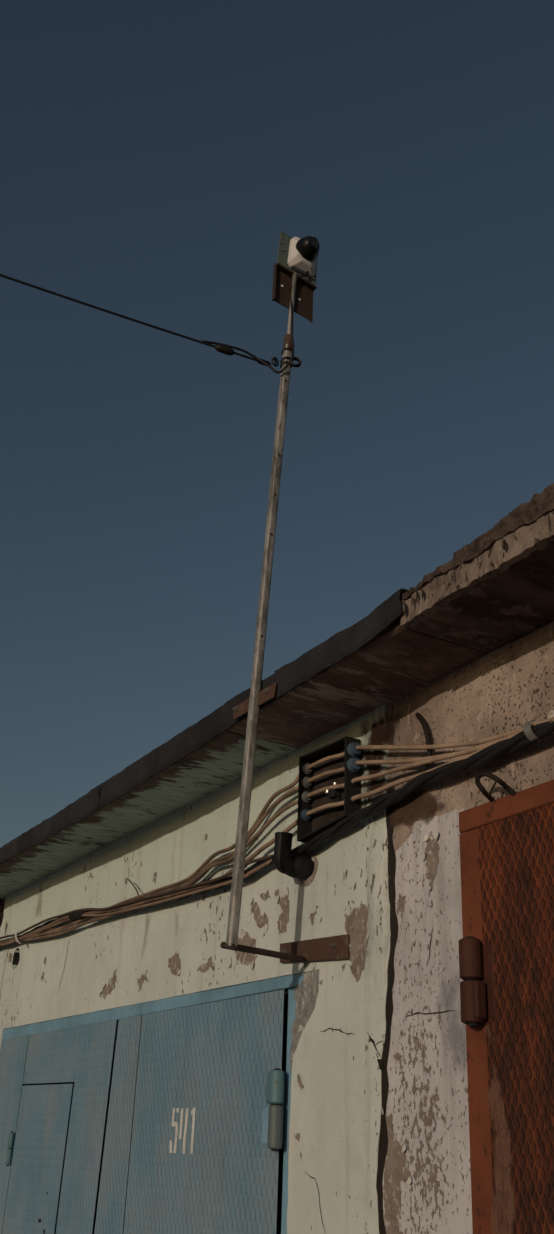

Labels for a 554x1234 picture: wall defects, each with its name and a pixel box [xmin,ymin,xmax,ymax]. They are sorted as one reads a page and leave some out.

peeling [99,969,117,1000]
peeling [168,950,181,976]
peeling [197,957,214,972]
peeling [233,851,318,969]
flaking render [289,964,323,1088]
peeling [342,904,369,982]
crack [320,787,452,1234]
peeling [377,1033,421,1070]
peeling [421,831,439,891]
peeling [382,1108,412,1234]
peeling [422,1093,440,1191]
corrosion [488,1067,515,1234]